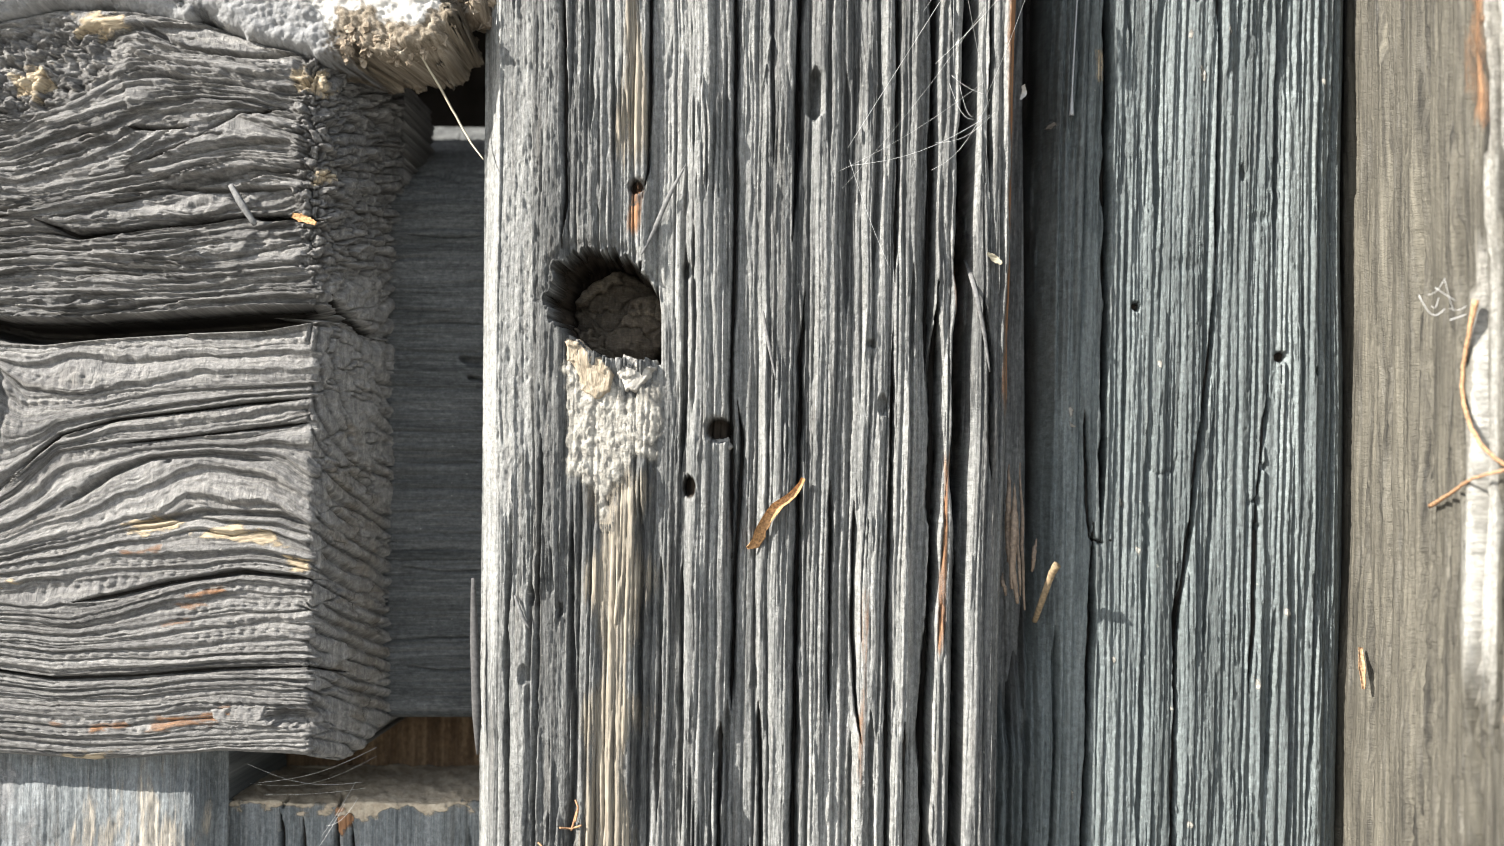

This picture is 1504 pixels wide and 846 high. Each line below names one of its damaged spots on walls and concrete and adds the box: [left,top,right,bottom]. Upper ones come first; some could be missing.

flaking render [335,0,497,68]
crack [1211,183,1219,285]
crack [0,294,375,344]
crack [5,398,310,487]
crack [1169,327,1210,846]